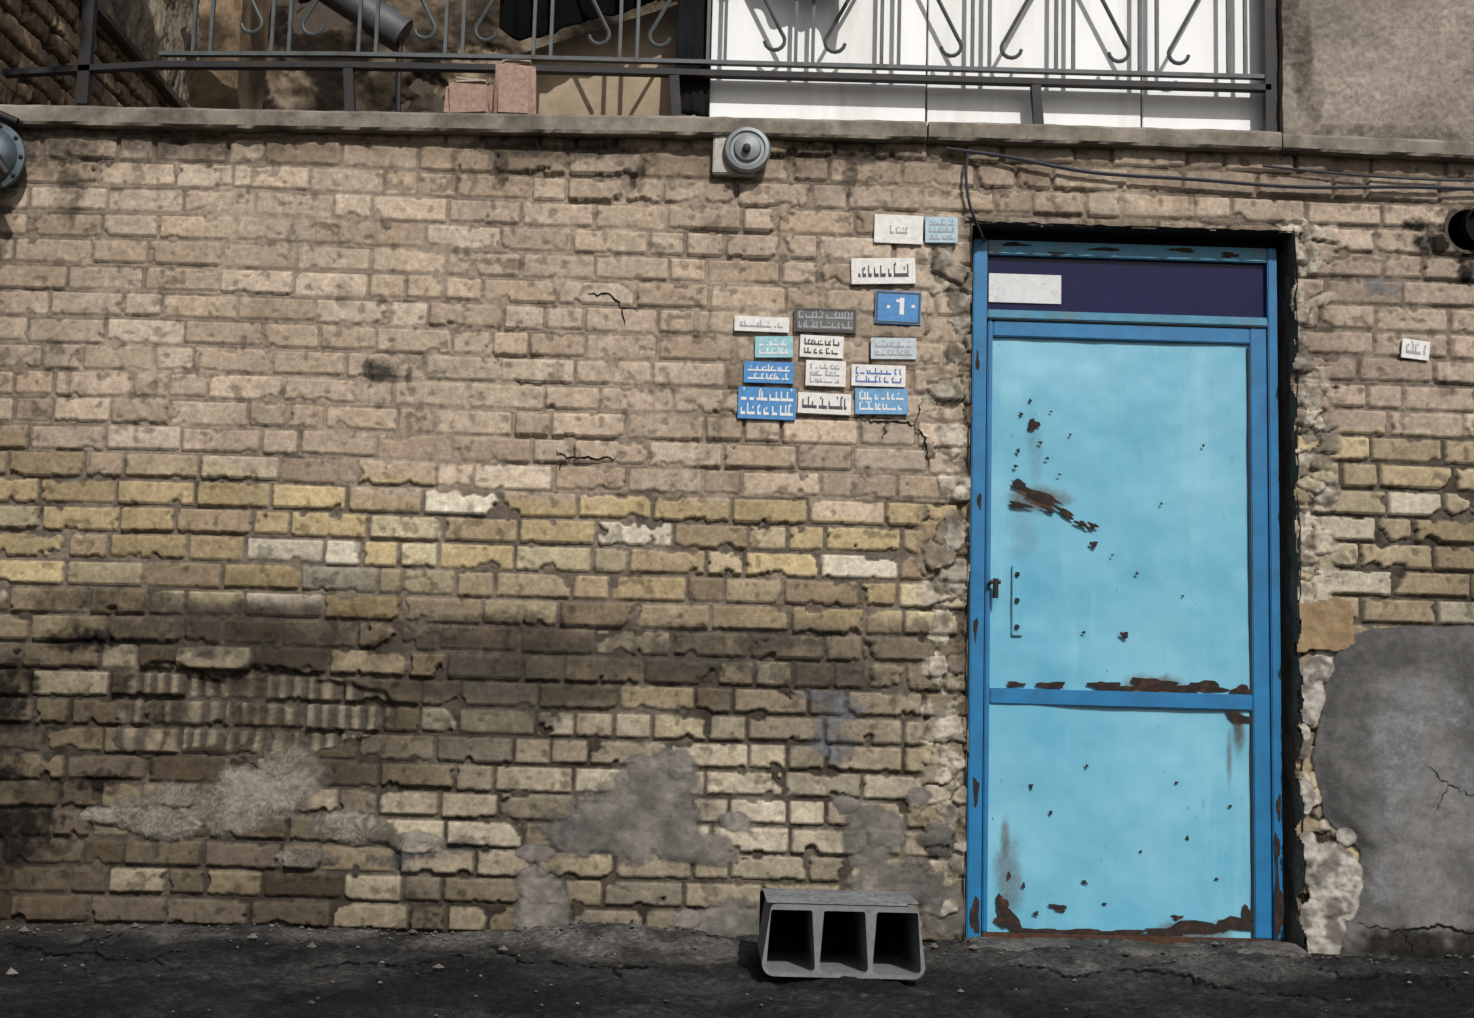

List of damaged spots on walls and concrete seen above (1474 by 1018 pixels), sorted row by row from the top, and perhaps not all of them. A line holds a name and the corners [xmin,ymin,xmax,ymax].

flaking render [1278,217,1329,468]
flaking render [904,243,982,876]
leakage [48,587,354,656]
leakage [0,659,39,730]
spalling [112,662,387,767]
rust [1006,681,1065,689]
rust [1087,677,1251,760]
peeling [1296,477,1364,955]
leakage [77,769,126,794]
crack [1424,762,1474,813]
rust [1274,794,1284,942]
rust [994,894,1252,937]